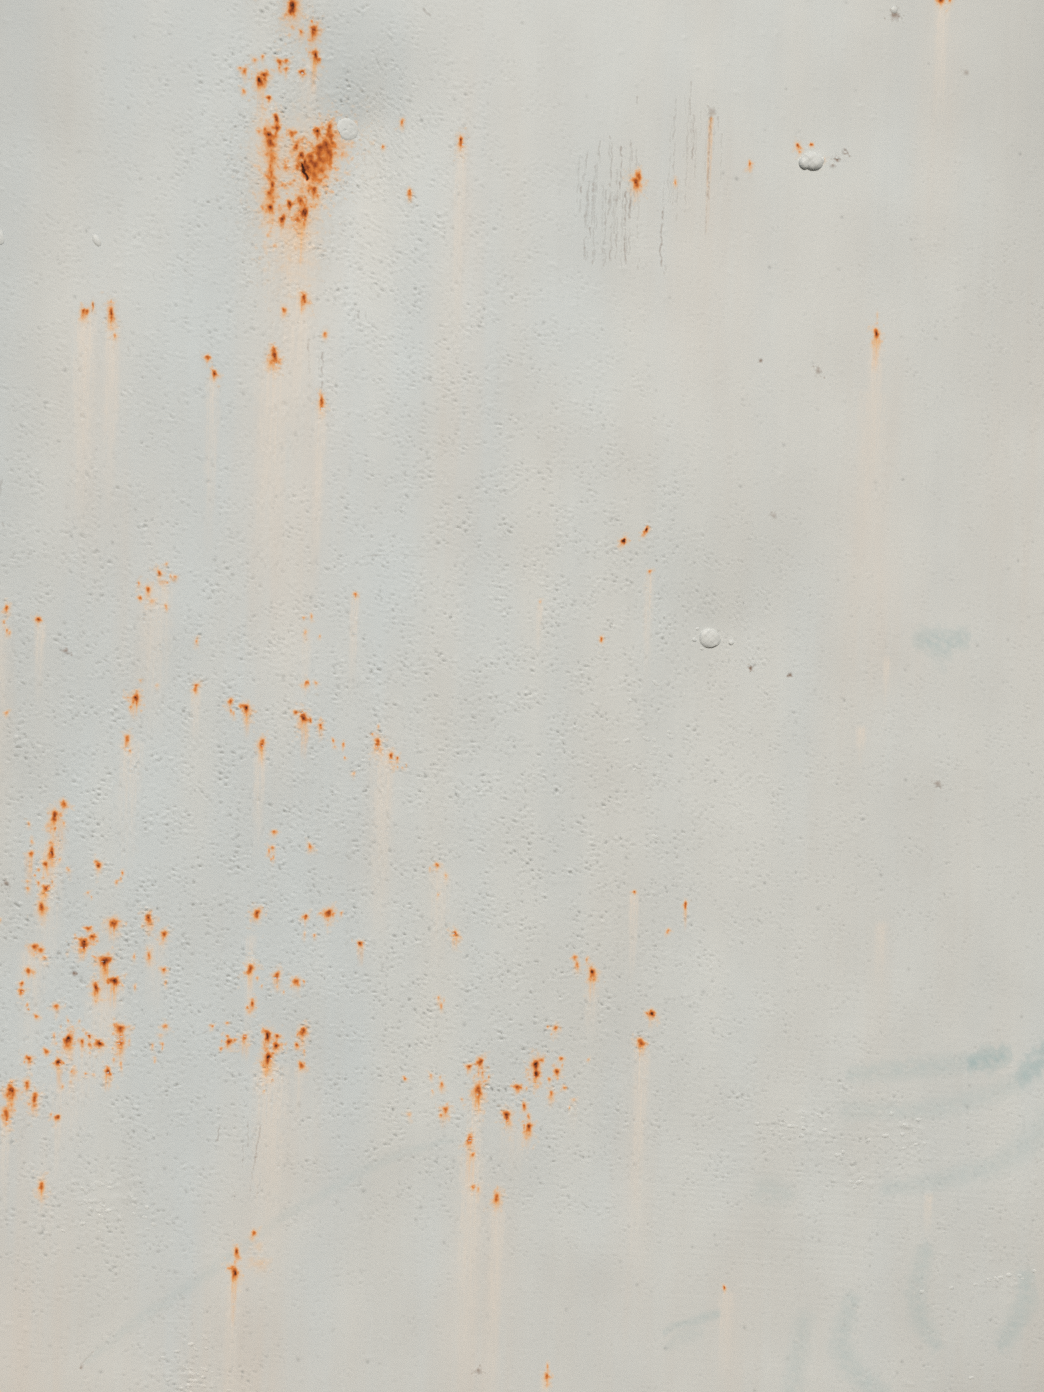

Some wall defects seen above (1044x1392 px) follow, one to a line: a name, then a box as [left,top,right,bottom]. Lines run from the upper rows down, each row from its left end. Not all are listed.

rust [195,0,418,466]
rust [615,522,654,553]
rust [221,693,259,740]
rust [288,702,359,782]
rust [0,793,175,1217]
rust [207,900,318,1392]
rust [399,951,606,1188]
rust [642,1005,662,1034]